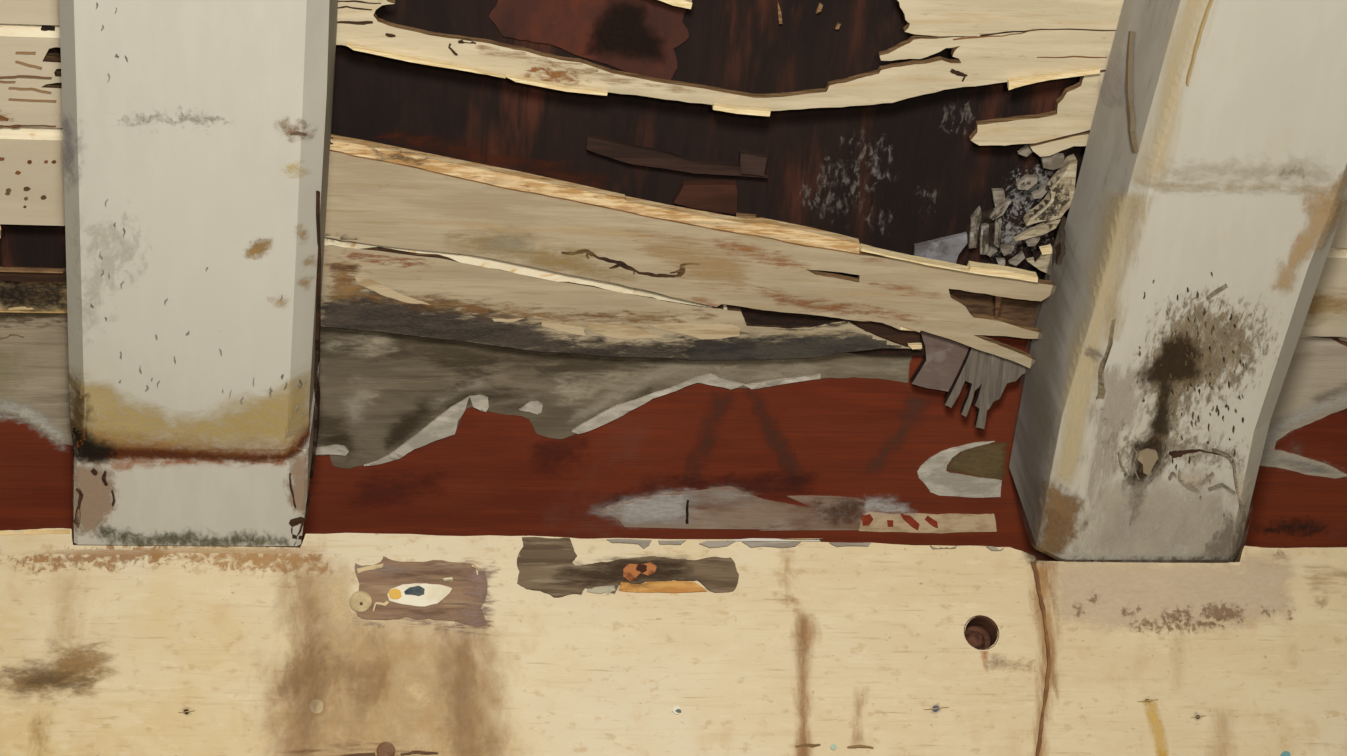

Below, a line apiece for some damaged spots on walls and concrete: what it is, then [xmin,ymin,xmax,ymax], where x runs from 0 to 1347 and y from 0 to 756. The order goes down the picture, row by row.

leakage [1125,31,1139,152]
leakage [1169,0,1213,92]
crack [561,249,700,278]
peeling [968,144,1066,273]
leakage [68,377,307,442]
peeling [17,326,912,574]
peeling [917,441,1005,498]
leakage [1034,198,1268,559]
peeling [1260,337,1347,479]
peeling [355,556,494,627]
peeling [517,486,1005,598]
leakage [288,642,472,756]